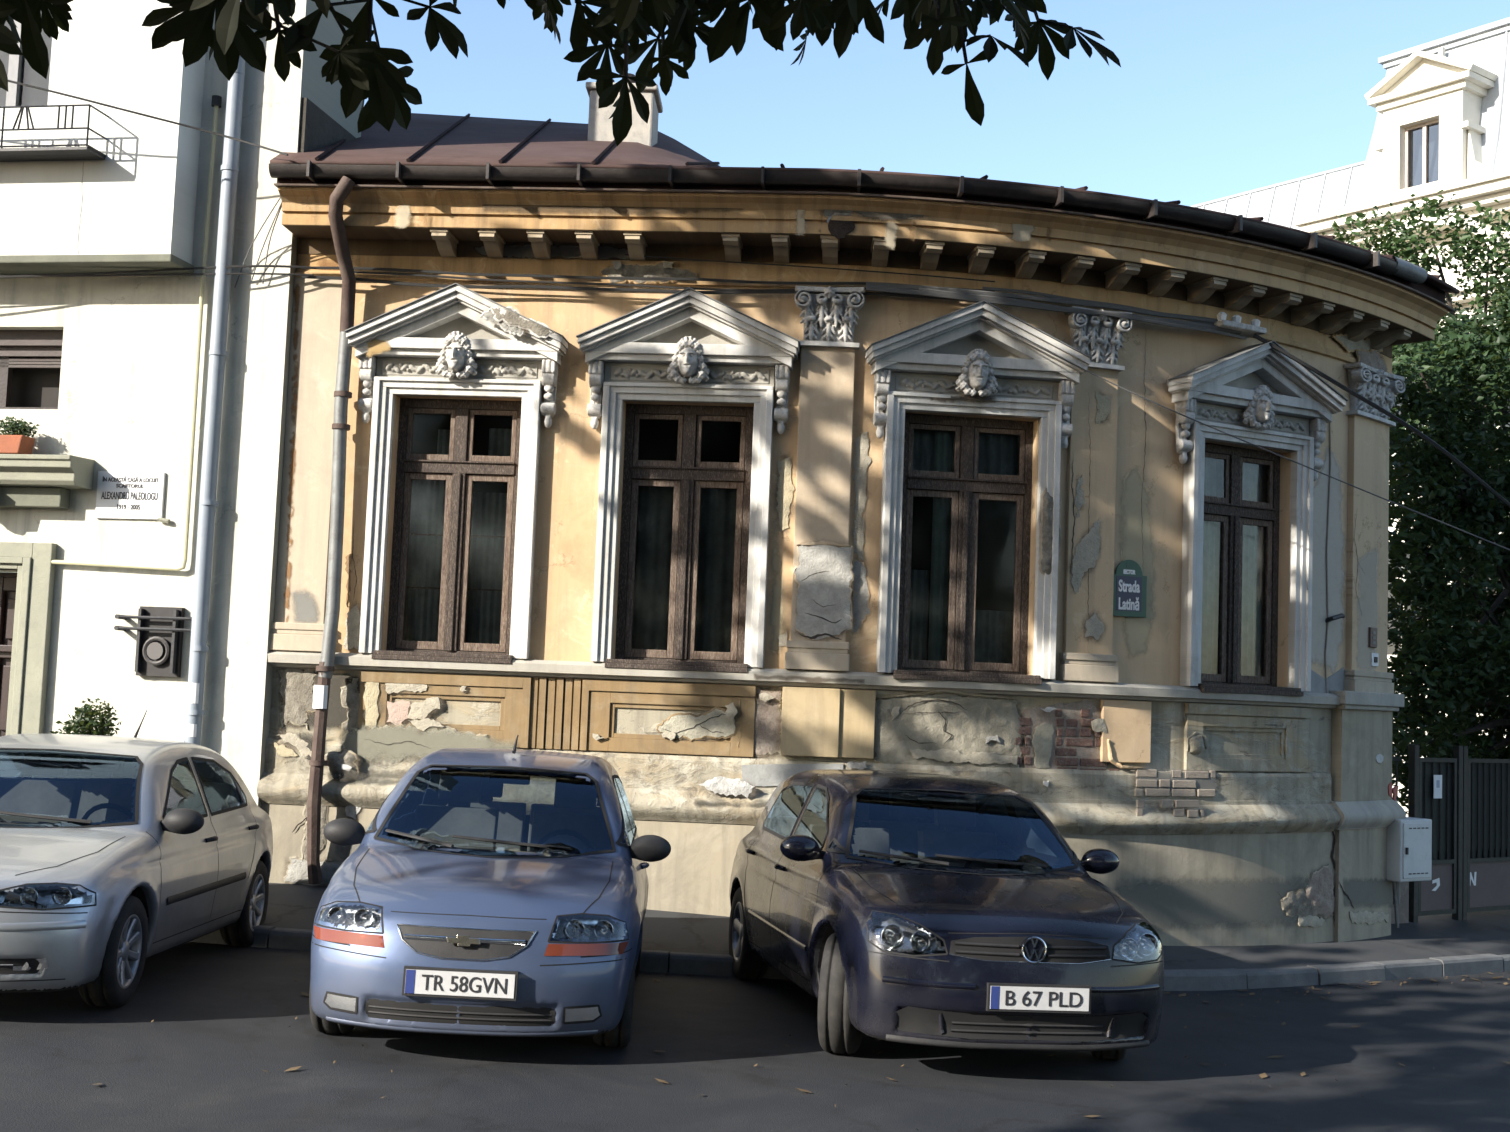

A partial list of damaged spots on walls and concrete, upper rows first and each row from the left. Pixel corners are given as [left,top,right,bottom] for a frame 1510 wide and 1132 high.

flaking render [776,431,871,646]
flaking render [1038,488,1062,576]
peeling [363,682,441,728]
flaking render [273,733,406,781]
flaking render [873,691,1219,818]